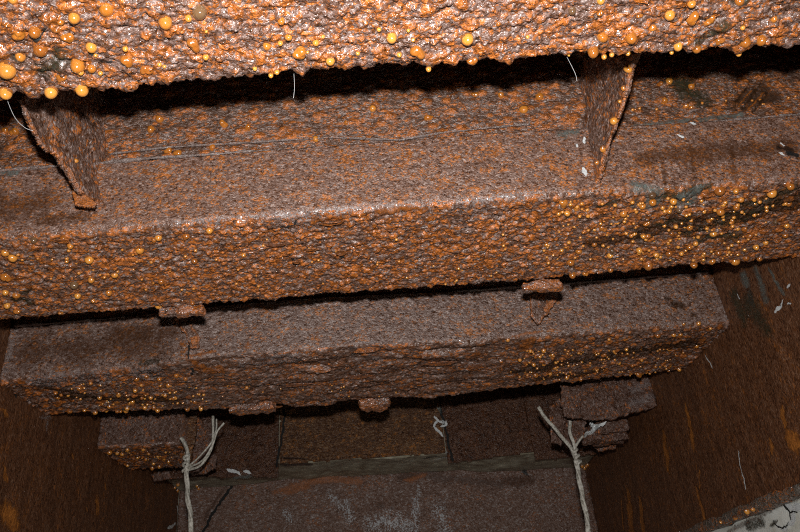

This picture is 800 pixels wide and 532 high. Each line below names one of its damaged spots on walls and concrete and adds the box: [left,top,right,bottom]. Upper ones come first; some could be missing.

corrosion [0,190,97,224]
corrosion [376,204,428,214]
corrosion [780,405,800,453]
corrosion [0,498,20,532]